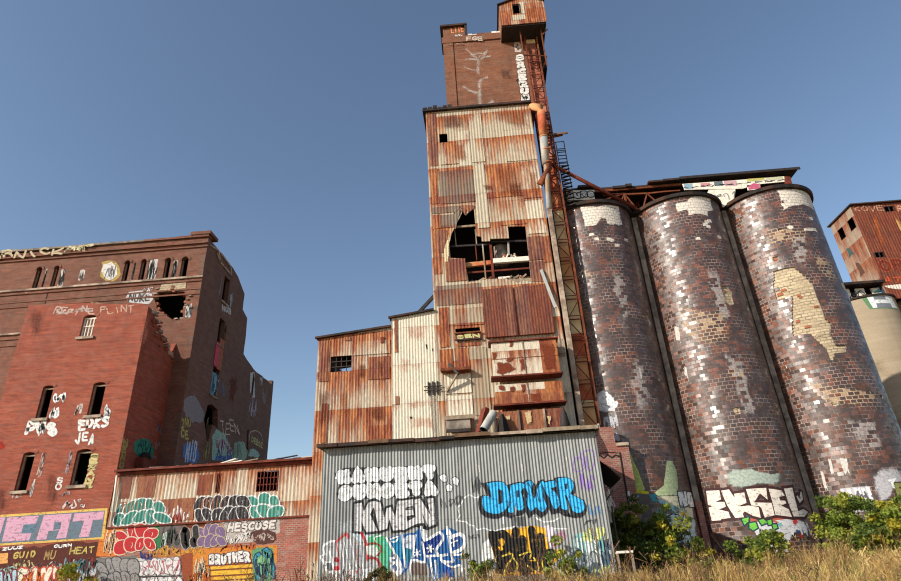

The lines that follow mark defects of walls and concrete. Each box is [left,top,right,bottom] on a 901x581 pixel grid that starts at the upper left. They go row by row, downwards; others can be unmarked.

rust [484,170,522,195]
spalling [151,282,192,362]
spalling [720,286,733,305]
spalling [773,257,846,363]